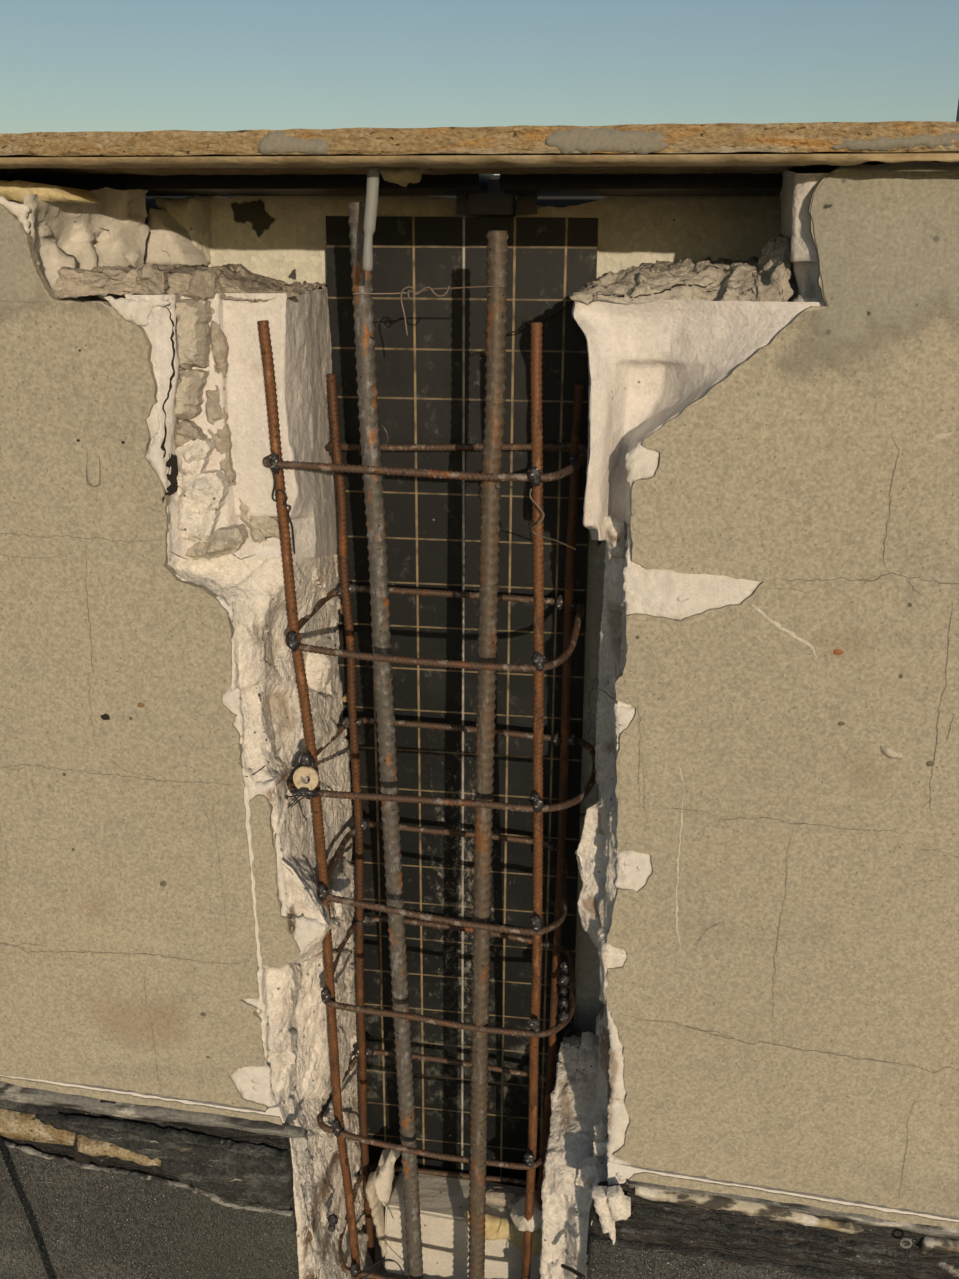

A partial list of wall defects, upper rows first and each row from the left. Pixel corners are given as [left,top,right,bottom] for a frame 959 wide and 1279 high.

crack [0,533,279,1094]
spalling [104,288,383,1279]
spalling [539,299,825,1279]
crack [598,436,959,1203]